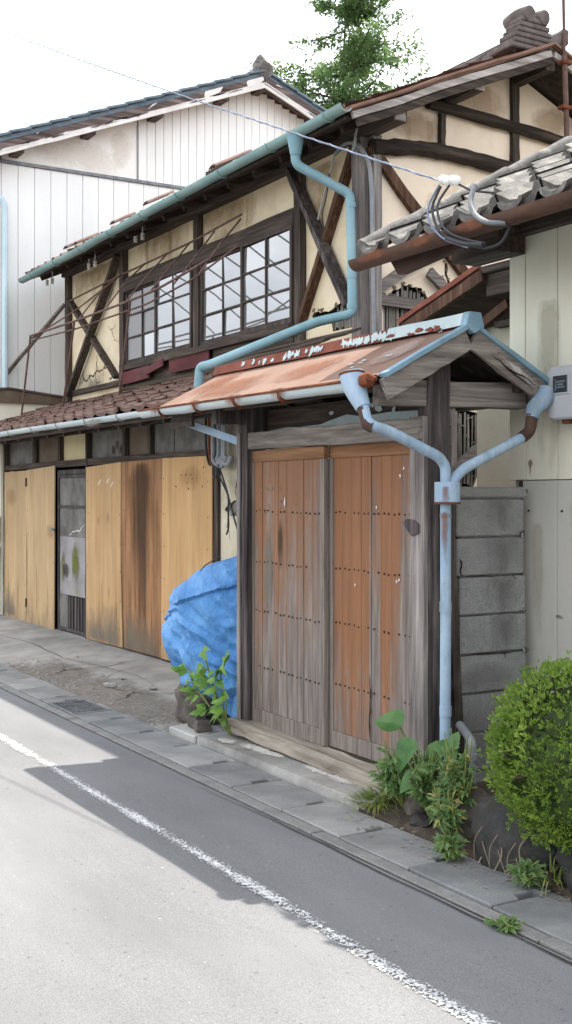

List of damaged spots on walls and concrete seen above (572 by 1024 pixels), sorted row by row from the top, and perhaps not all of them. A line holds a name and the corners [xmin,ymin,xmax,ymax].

crack [79,329,117,384]
peeling [241,345,323,366]
peeling [341,312,466,357]
rust [136,360,376,418]
leakage [133,464,147,576]